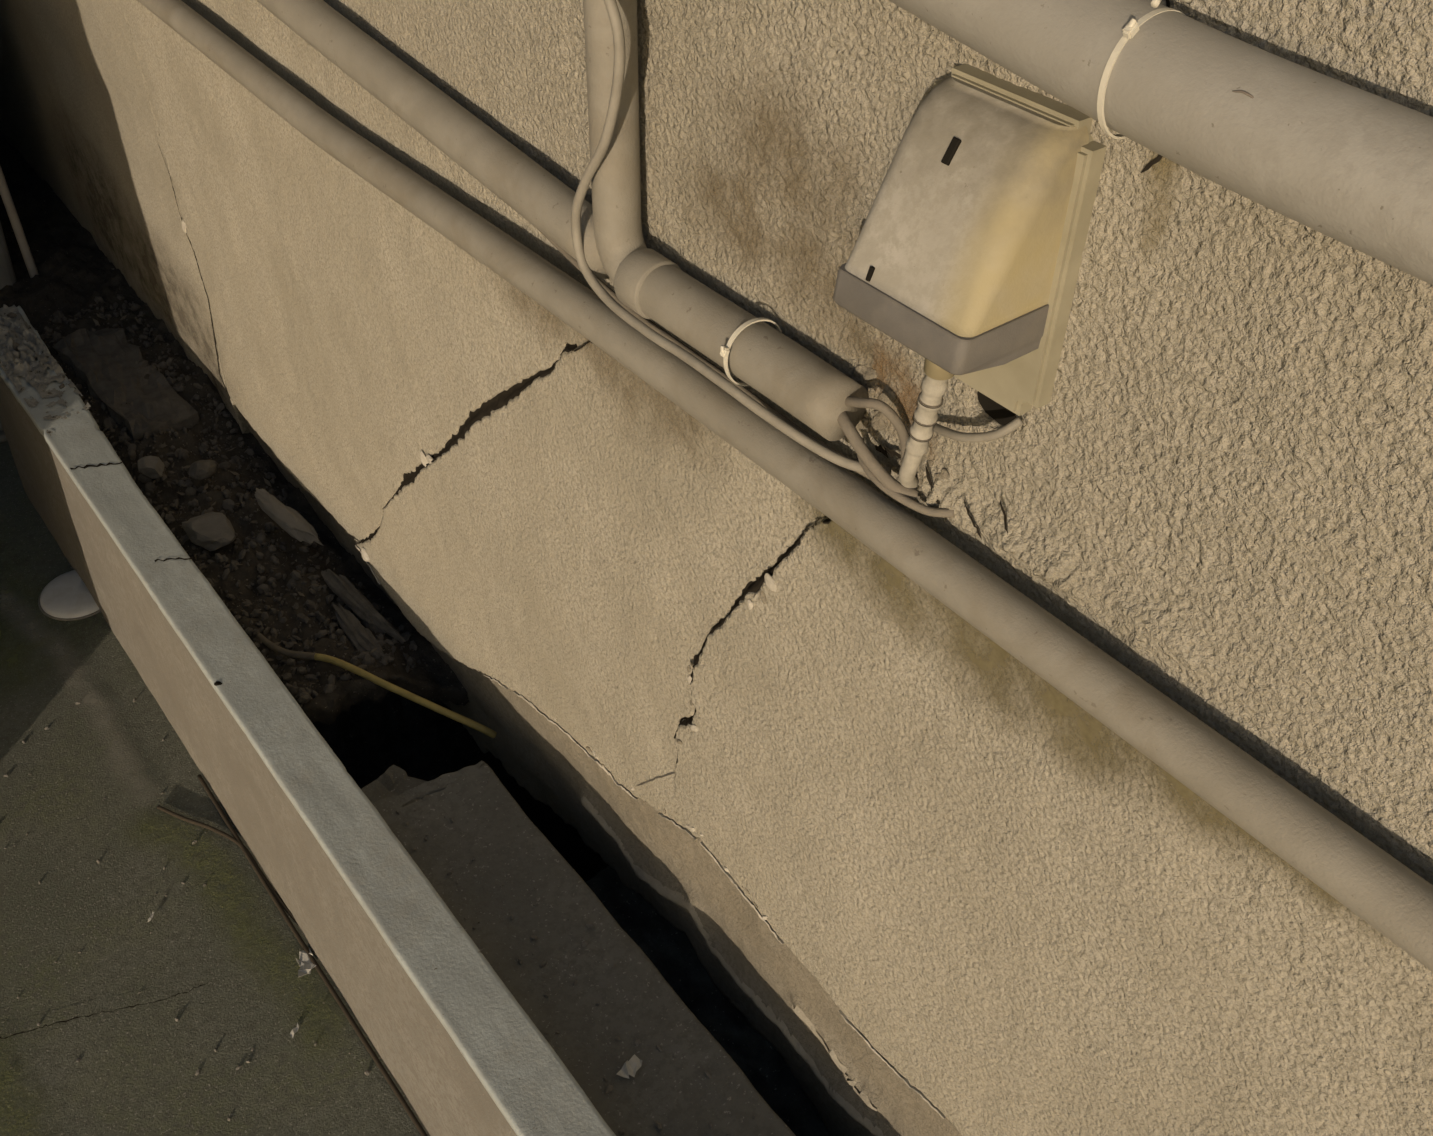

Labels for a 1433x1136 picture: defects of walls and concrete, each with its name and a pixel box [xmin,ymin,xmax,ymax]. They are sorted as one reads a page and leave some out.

crack [1141,155,1163,173]
crack [354,341,592,562]
crack [637,517,831,786]